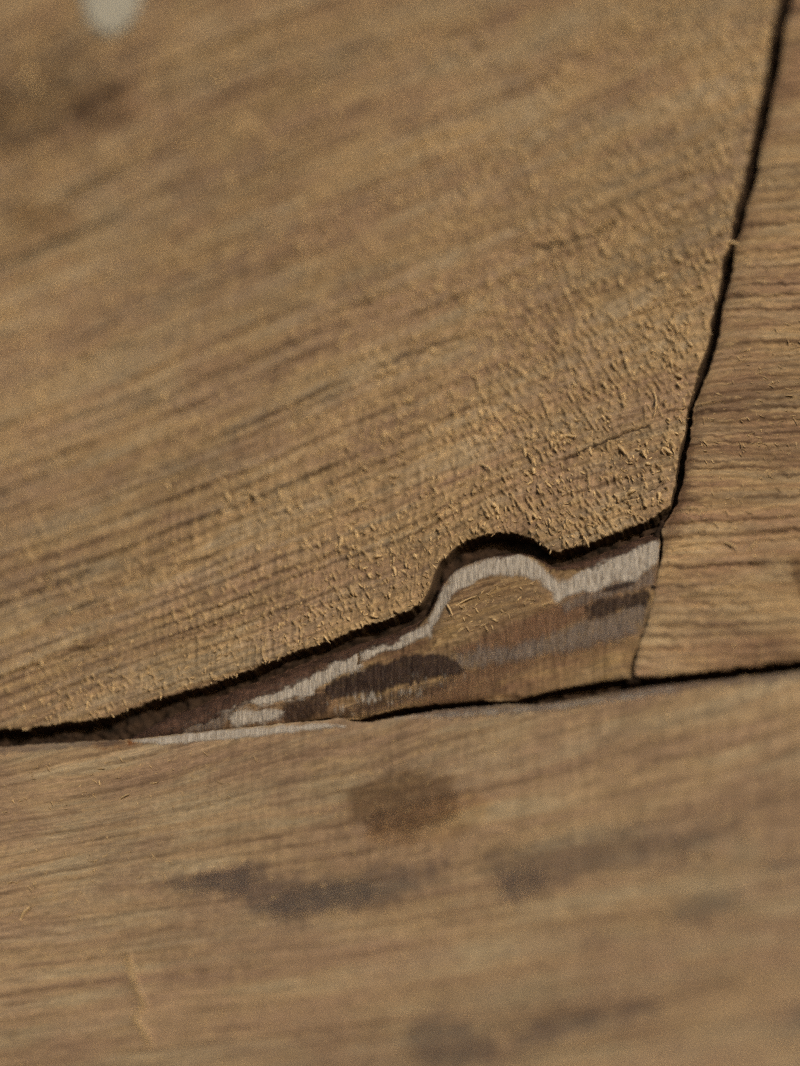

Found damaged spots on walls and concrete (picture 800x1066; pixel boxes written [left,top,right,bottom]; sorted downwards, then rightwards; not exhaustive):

peeling [134,540,660,744]
crack [0,0,800,747]